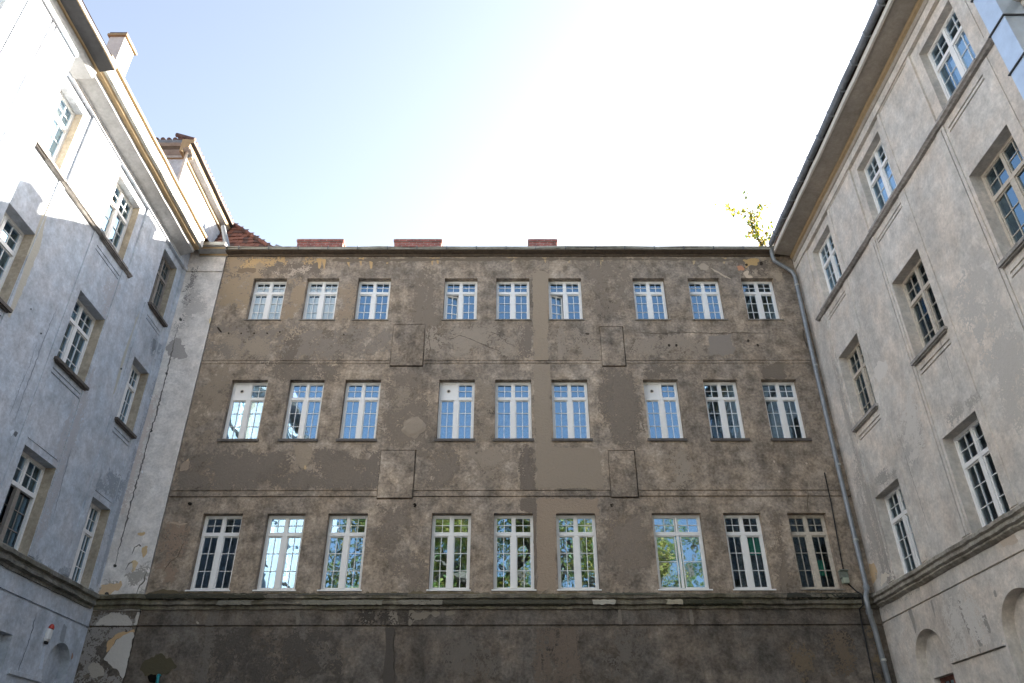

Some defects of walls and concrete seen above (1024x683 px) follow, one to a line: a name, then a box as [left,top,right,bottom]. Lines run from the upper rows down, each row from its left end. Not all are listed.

crack [115,327,184,594]
spalling [98,532,151,595]
peeling [88,612,140,678]